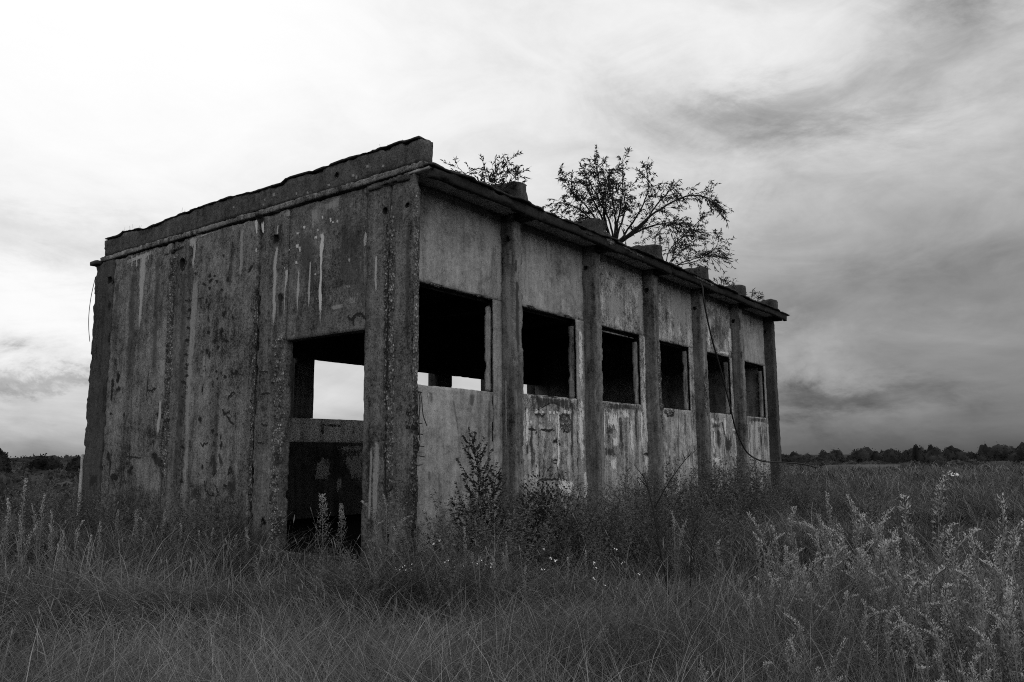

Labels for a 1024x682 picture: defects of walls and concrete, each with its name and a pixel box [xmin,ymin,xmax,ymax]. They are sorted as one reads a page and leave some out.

damp [272,198,355,323]
damp [183,281,205,497]
damp [527,395,578,467]